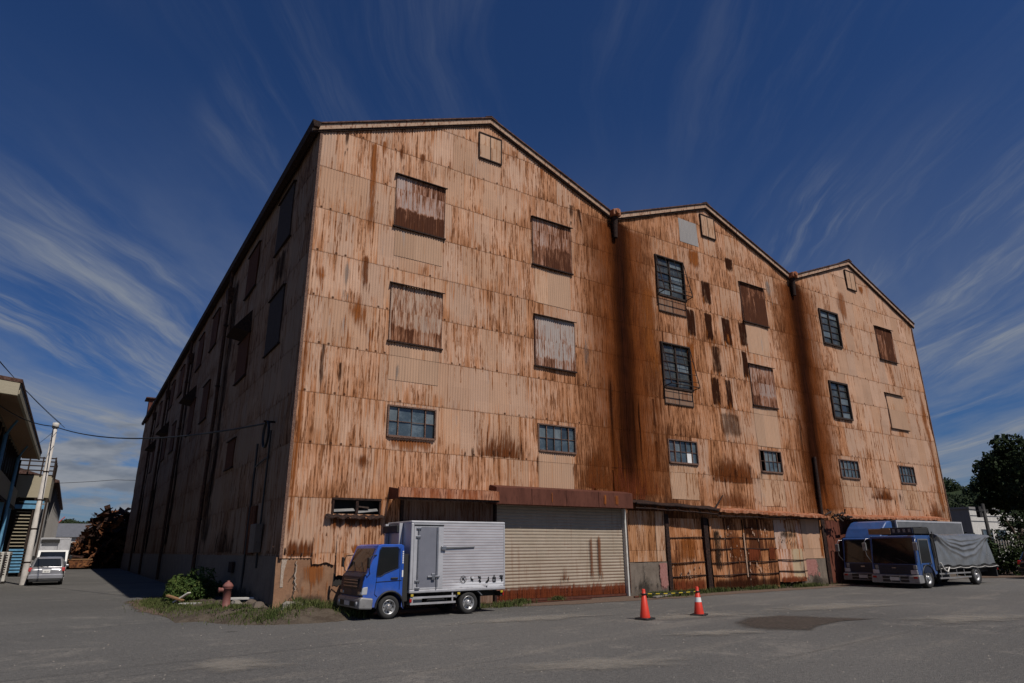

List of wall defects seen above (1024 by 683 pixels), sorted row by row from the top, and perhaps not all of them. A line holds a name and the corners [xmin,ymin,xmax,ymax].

corrosion [369,141,386,228]
corrosion [689,250,698,273]
corrosion [340,243,374,352]
corrosion [686,281,750,435]
corrosion [272,267,330,584]
corrosion [391,440,430,462]
corrosion [465,424,522,458]
corrosion [711,454,762,506]
corrosion [499,538,625,600]
corrosion [675,523,807,590]